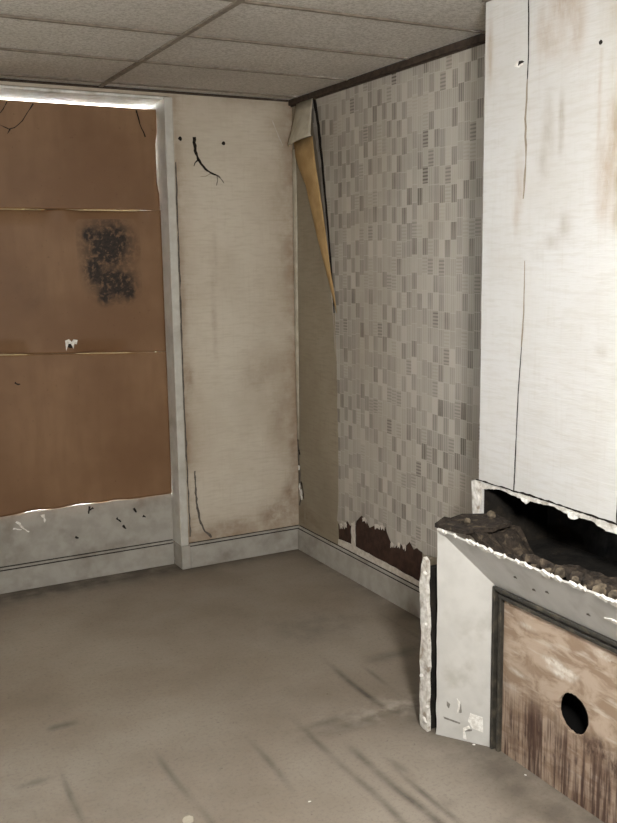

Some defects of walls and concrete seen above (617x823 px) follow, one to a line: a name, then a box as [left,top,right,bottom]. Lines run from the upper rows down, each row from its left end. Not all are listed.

crack [0,101,34,134]
leakage [75,219,143,309]
crack [175,137,224,538]
spalling [471,479,617,534]
spalling [437,528,617,607]
spalling [419,556,433,732]
peeling [443,699,483,739]